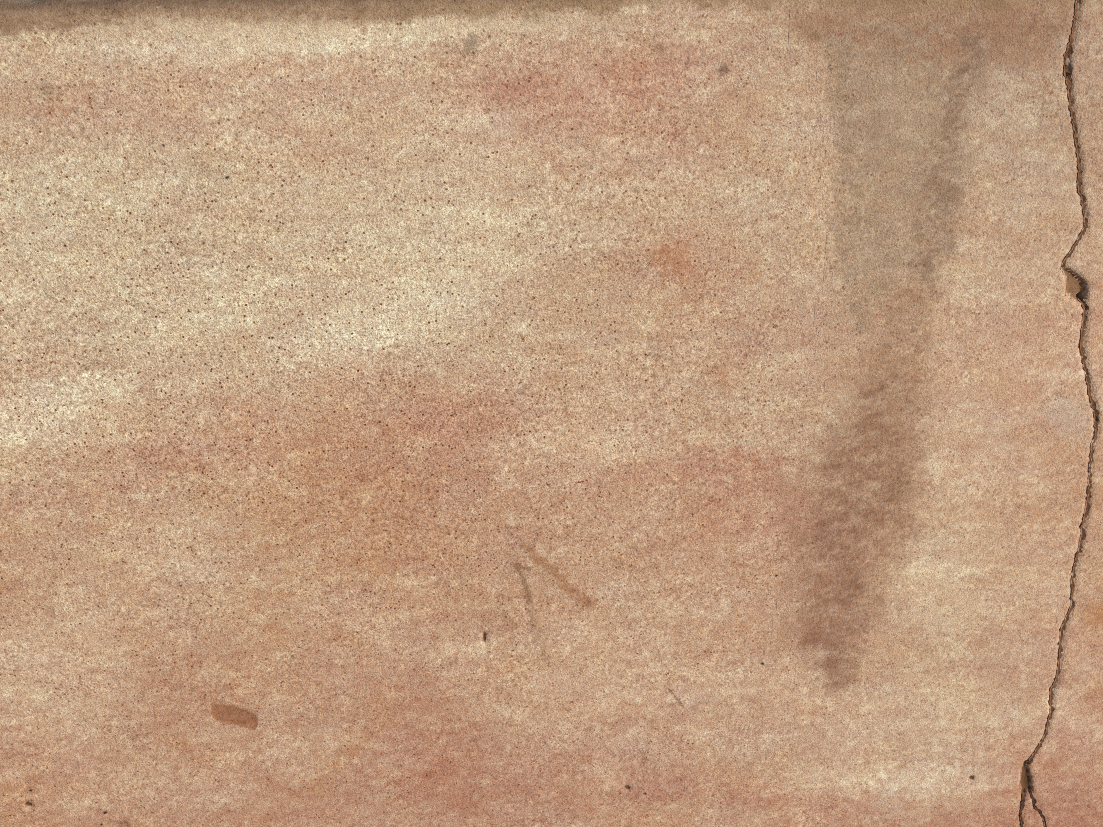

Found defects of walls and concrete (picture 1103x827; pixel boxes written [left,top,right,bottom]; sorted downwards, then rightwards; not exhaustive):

leakage [767,0,1084,700]
crack [1019,0,1100,827]
leakage [1041,391,1095,442]